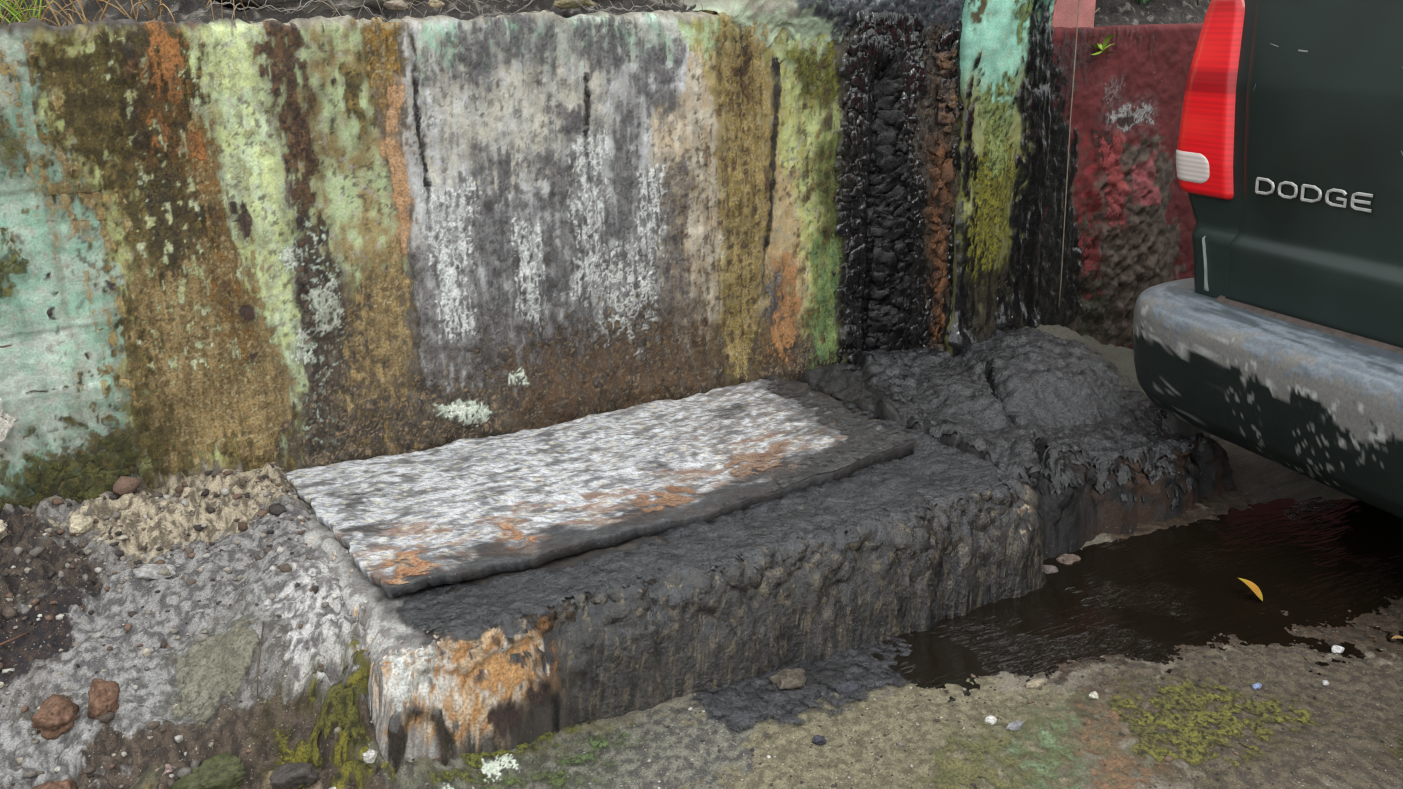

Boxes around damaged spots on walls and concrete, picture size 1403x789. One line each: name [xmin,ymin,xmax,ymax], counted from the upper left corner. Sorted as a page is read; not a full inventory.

corrosion [140,20,208,160]
corrosion [380,83,413,255]
leakage [0,0,1025,504]
peeling [0,397,19,442]
corrosion [724,443,785,478]
corrosion [630,485,703,513]
corrosion [499,518,537,542]
corrosion [372,545,440,584]